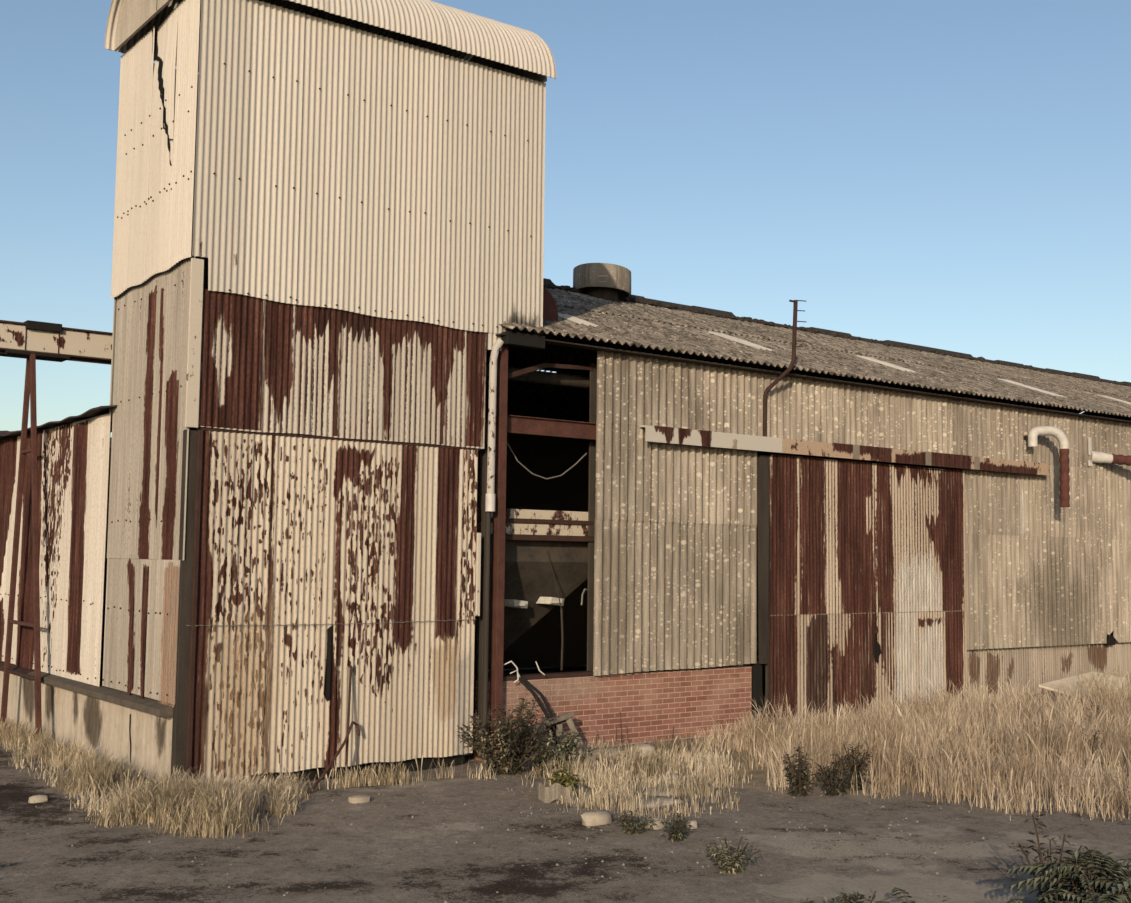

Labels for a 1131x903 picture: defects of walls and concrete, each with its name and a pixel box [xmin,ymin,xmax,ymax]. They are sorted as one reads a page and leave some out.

crack [152,27,173,166]
corrosion [0,330,25,347]
corrosion [0,420,88,675]
corrosion [126,285,180,707]
corrosion [191,289,486,781]
corrosion [654,426,712,447]
corrosion [770,443,1039,727]